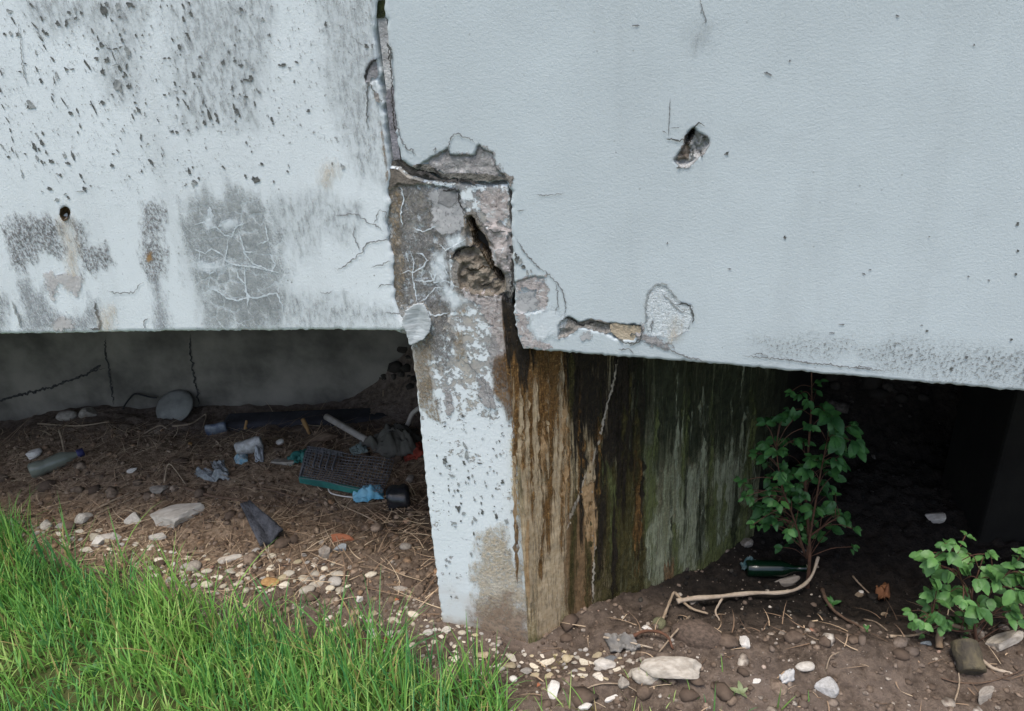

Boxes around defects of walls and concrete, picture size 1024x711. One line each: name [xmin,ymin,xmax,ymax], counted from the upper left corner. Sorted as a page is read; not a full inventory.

crack [324,0,566,342]
spalling [663,103,710,169]
leakage [0,215,113,333]
leakage [140,204,169,329]
leakage [178,186,376,330]
crack [0,283,141,404]
crack [189,339,200,405]
spalling [388,133,694,643]
leakage [862,340,1024,385]
leakage [496,294,790,643]